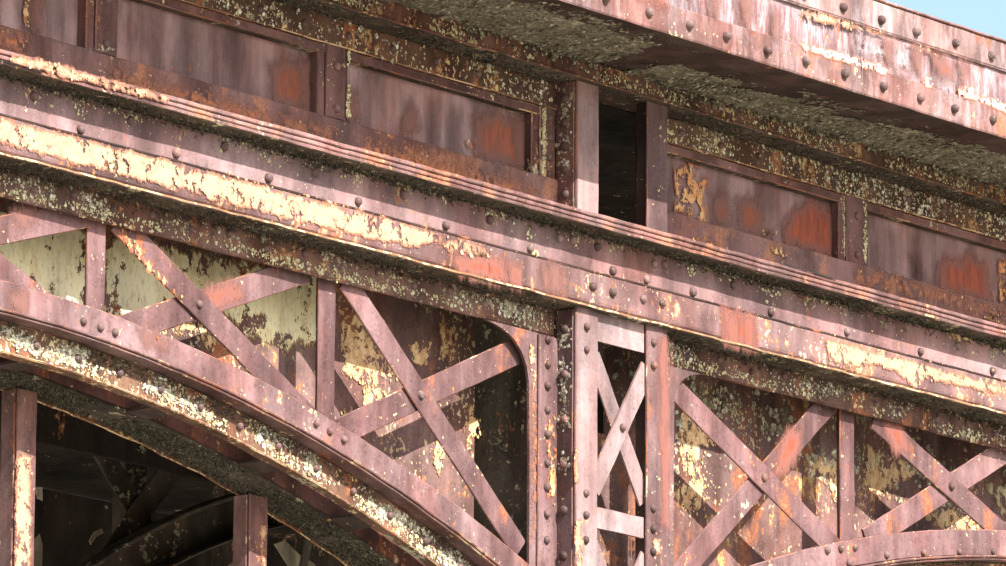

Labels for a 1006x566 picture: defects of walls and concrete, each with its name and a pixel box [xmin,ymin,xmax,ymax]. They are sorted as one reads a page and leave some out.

peeling [10,53,169,103]
peeling [799,42,891,76]
corrosion [361,102,544,196]
peeling [0,118,492,258]
peeling [672,162,710,223]
corrosion [712,190,832,257]
peeling [0,229,86,305]
corrosion [853,251,1006,321]
peeling [340,313,398,415]
peeling [822,337,1001,394]
peeling [678,408,716,525]
peeling [14,449,33,566]